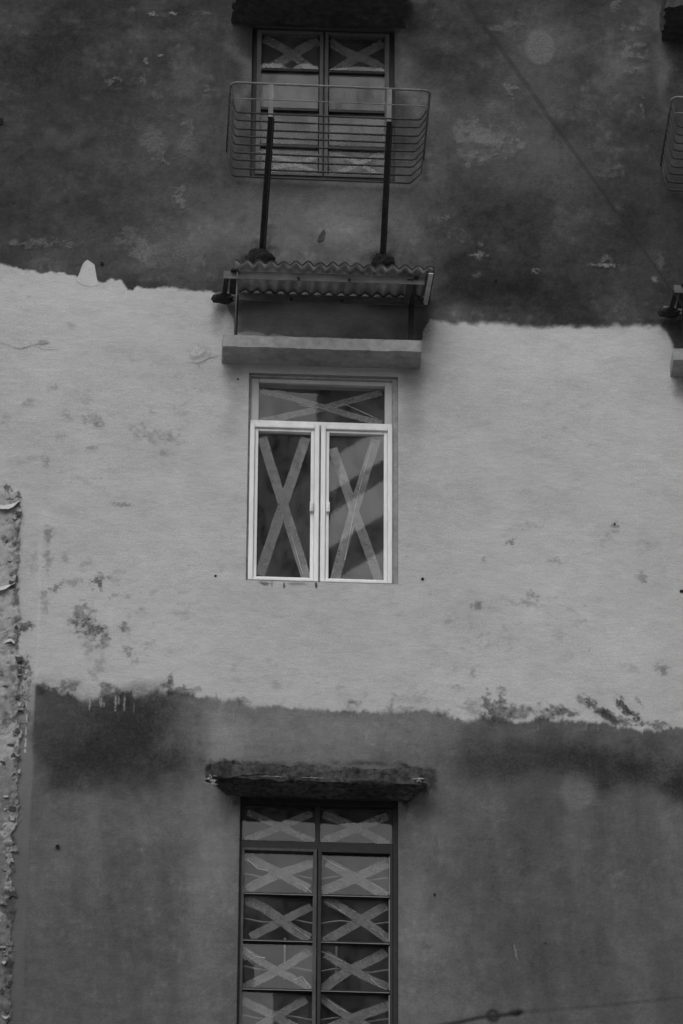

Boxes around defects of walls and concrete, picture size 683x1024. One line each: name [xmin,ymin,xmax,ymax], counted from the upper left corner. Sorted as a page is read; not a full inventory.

peeling [0,484,35,1024]
peeling [585,698,639,724]